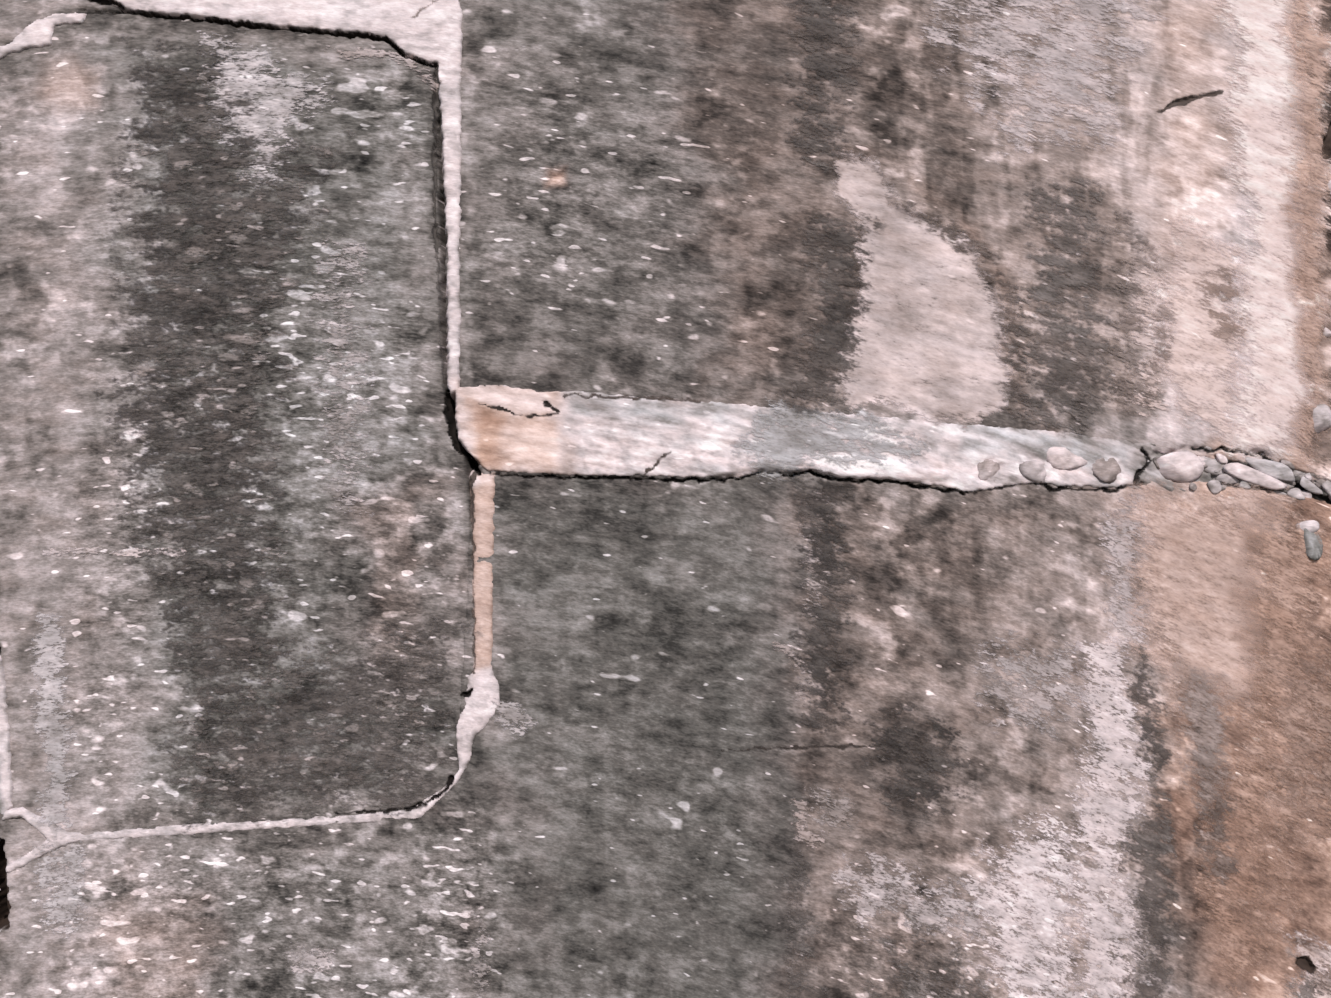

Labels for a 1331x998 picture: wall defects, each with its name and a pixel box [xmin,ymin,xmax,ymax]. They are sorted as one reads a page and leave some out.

damp [42,30,470,827]
crack [334,775,454,815]
crack [84,0,1152,674]
damp [783,787,858,998]
damp [772,470,971,817]
damp [832,494,1179,998]
crack [1191,446,1331,504]